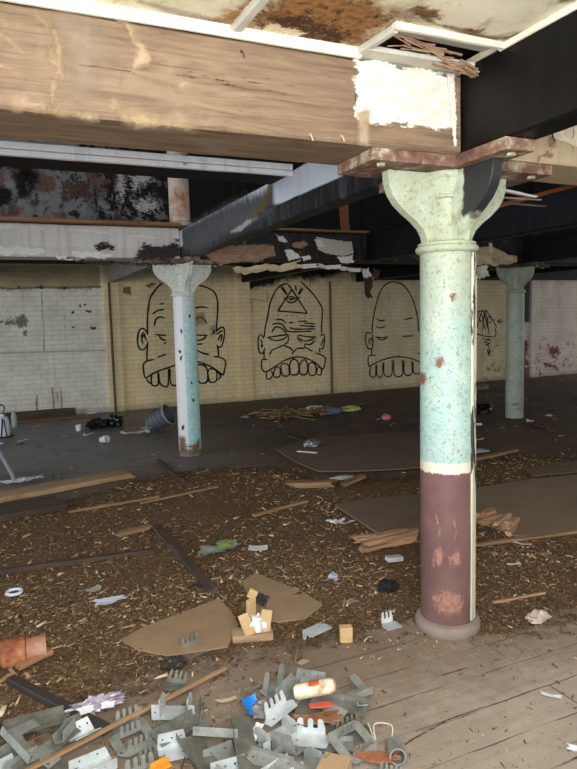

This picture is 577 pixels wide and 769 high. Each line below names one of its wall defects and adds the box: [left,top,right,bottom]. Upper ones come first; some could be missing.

peeling [351,59,458,146]
peeling [552,125,577,147]
peeling [113,174,162,216]
peeling [65,227,112,235]
peeling [0,244,112,262]
peeling [233,234,380,299]
peeling [477,242,517,280]
peeling [0,314,29,336]
spalling [539,344,561,375]
rust [179,436,202,457]
rust [432,547,462,568]
rust [432,587,464,617]